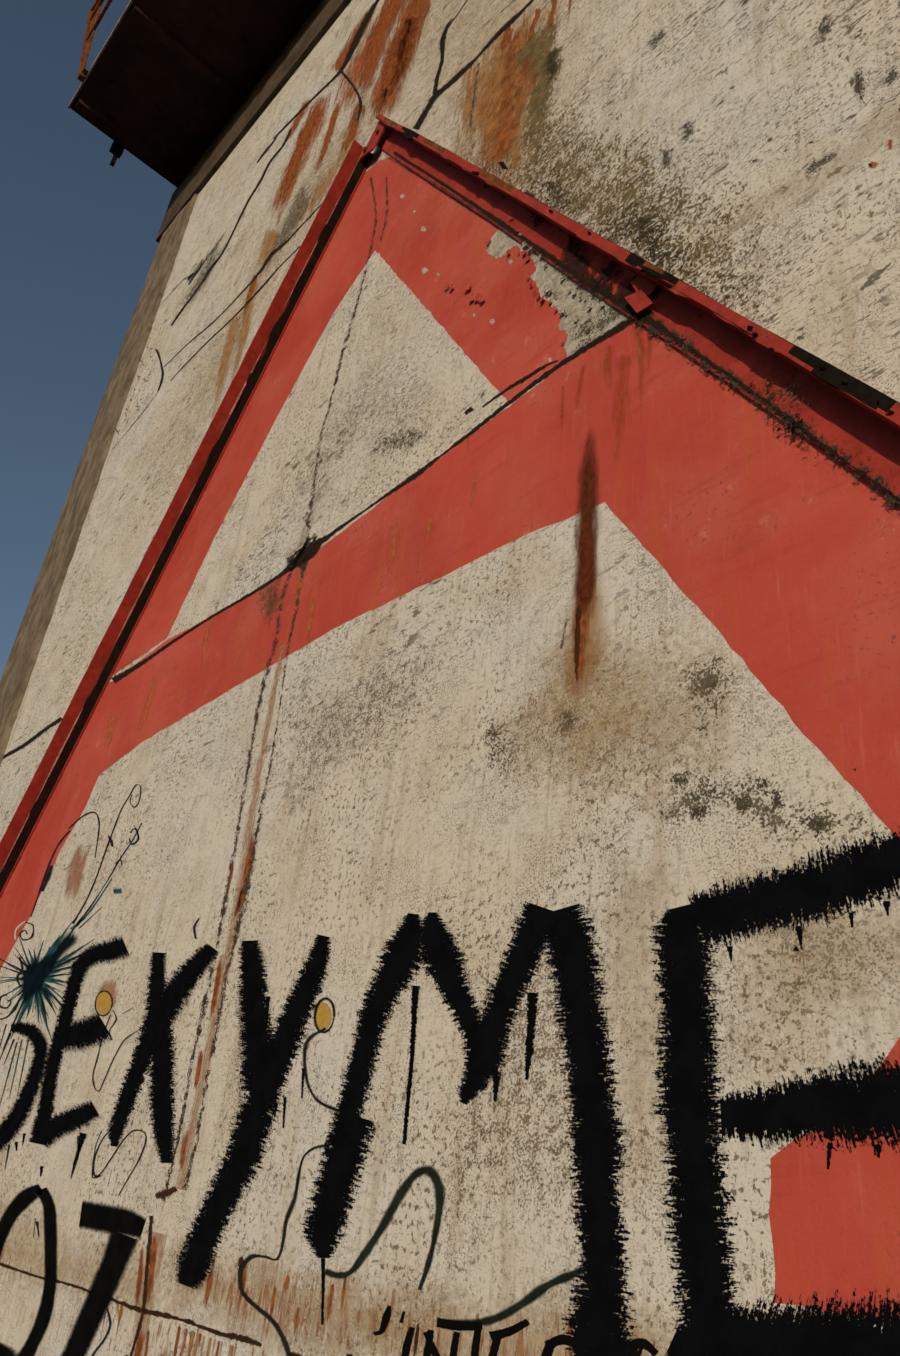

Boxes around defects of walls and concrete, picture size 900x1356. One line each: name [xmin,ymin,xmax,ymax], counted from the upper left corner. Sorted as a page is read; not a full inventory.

corrosion [273,0,900,414]
mould [468,16,782,320]
spalling [661,116,714,169]
spalling [802,152,838,178]
spalling [813,14,835,47]
spalling [849,61,899,103]
corrosion [216,231,278,399]
peeling [485,228,629,379]
corrosion [560,442,599,683]
crack [0,177,635,1356]
corrosion [152,1323,237,1356]
corrosion [199,1254,394,1335]